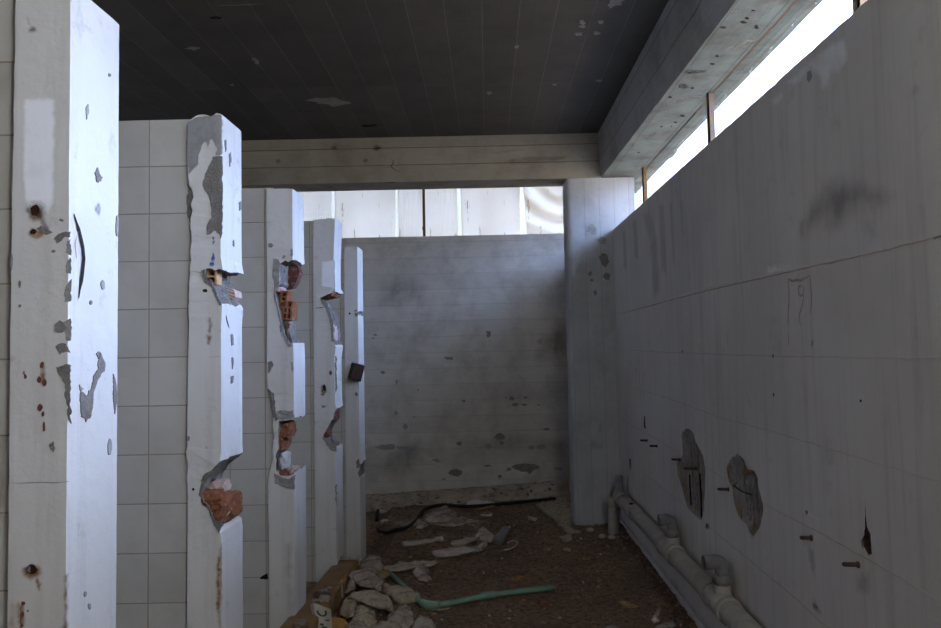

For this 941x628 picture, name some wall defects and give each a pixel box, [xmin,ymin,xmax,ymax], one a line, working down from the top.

flaking render [202,140,232,239]
flaking render [37,218,72,302]
peeling [268,243,297,347]
peeling [320,293,340,342]
flaking render [54,318,118,424]
spalling [267,389,297,452]
spalling [198,467,243,534]
peeling [274,465,300,490]
spalling [677,428,705,520]
spalling [727,453,763,536]
spalling [861,510,872,556]